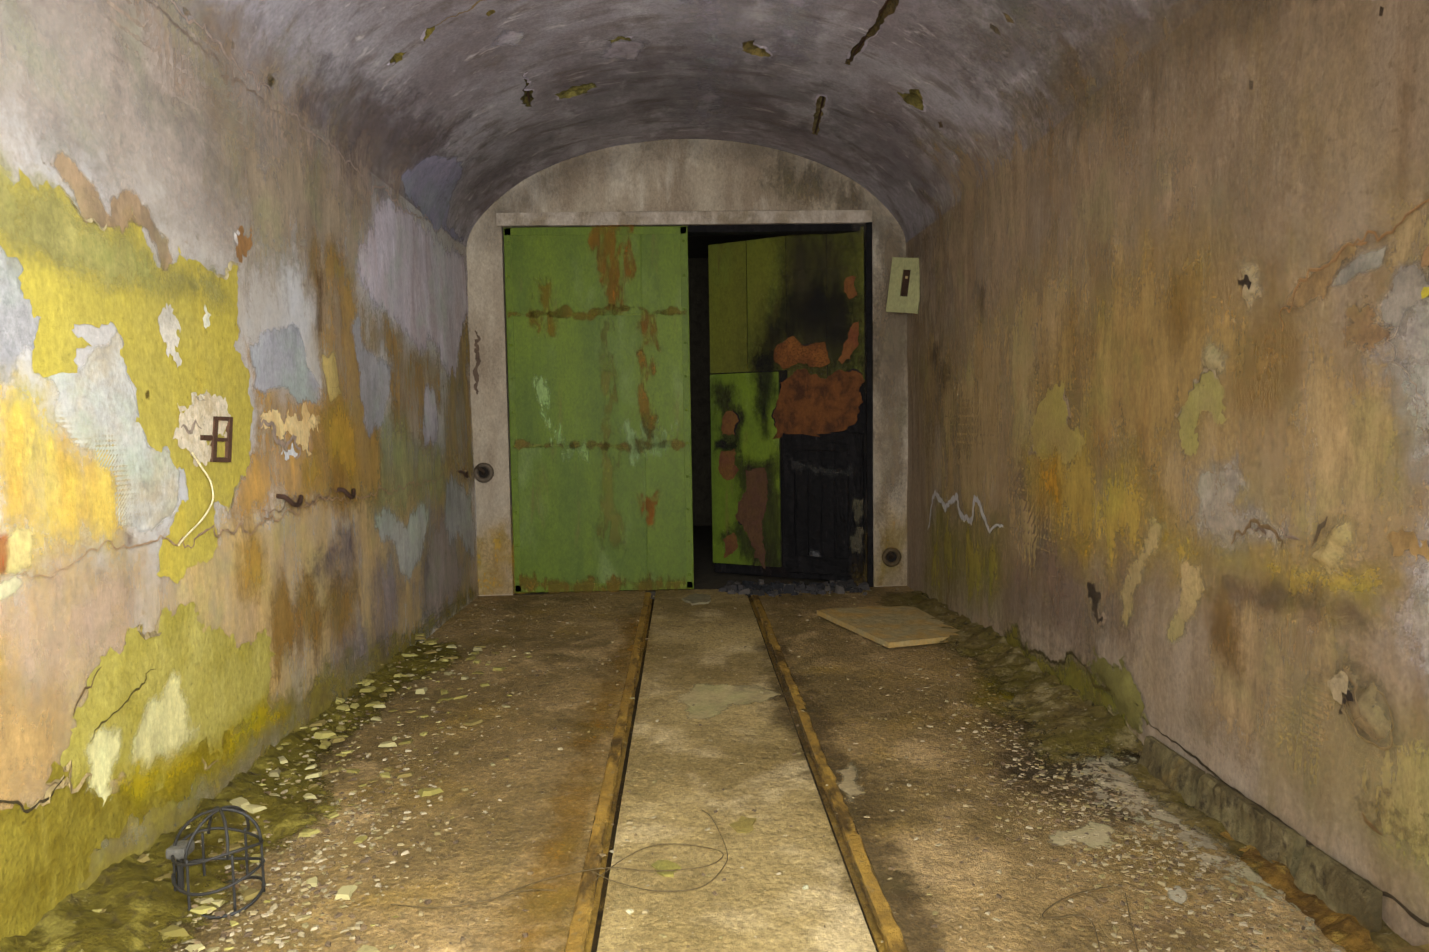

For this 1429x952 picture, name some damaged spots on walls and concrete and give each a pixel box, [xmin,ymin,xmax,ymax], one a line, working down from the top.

peeling [0,151,320,584]
damp [0,0,515,728]
corrosion [508,225,685,453]
damp [913,0,1429,794]
peeling [1332,247,1429,331]
damp [0,385,141,811]
peeling [26,602,275,809]
damp [985,709,1141,821]
crack [1149,723,1316,847]
damp [1353,724,1429,870]
crack [1365,879,1429,927]